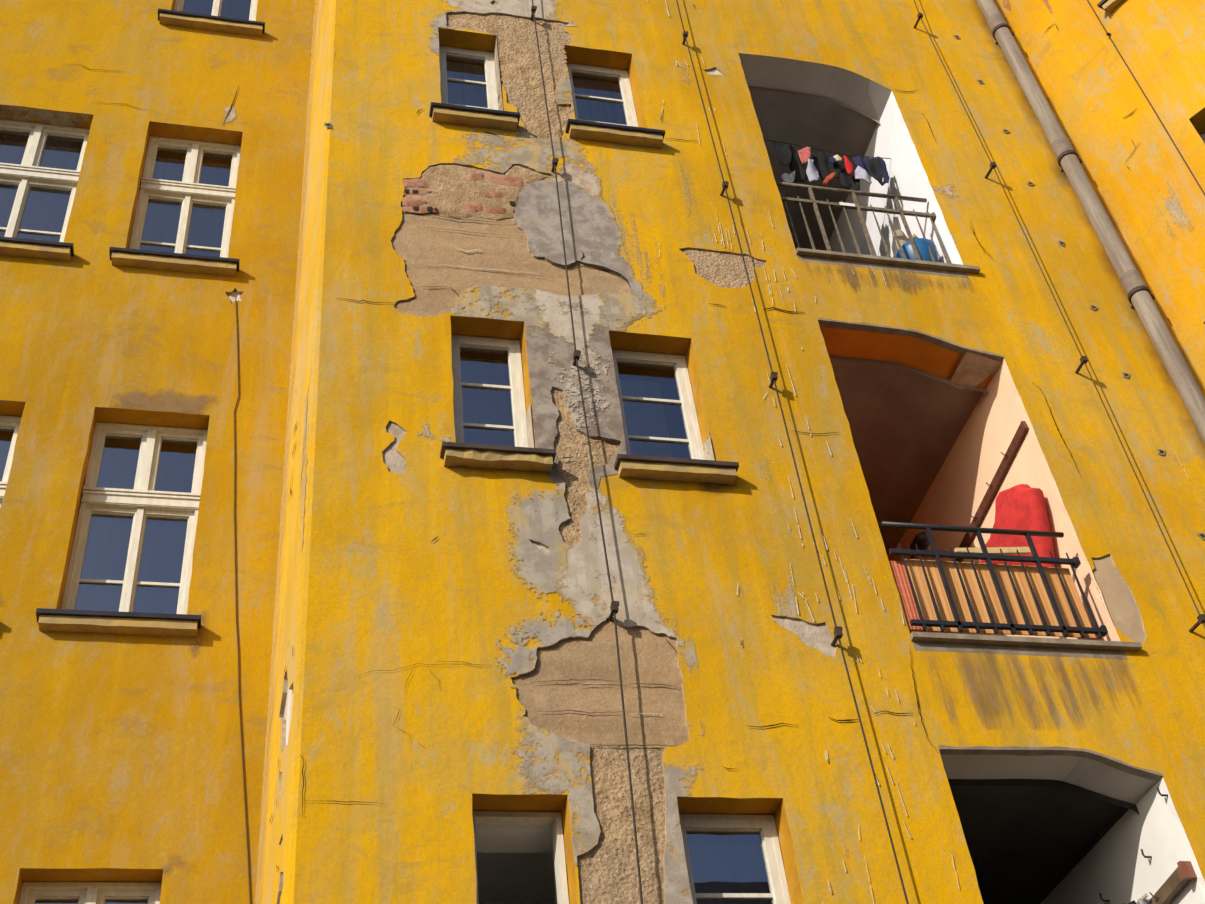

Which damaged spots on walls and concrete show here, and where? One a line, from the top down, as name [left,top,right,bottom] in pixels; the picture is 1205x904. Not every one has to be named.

flaking render [679,247,767,288]
flaking render [382,0,704,904]
flaking render [766,574,837,657]
flaking render [1090,554,1146,645]
crack [356,661,493,748]
damp [1014,661,1057,726]
damp [1056,655,1078,713]
flaking render [255,633,293,904]